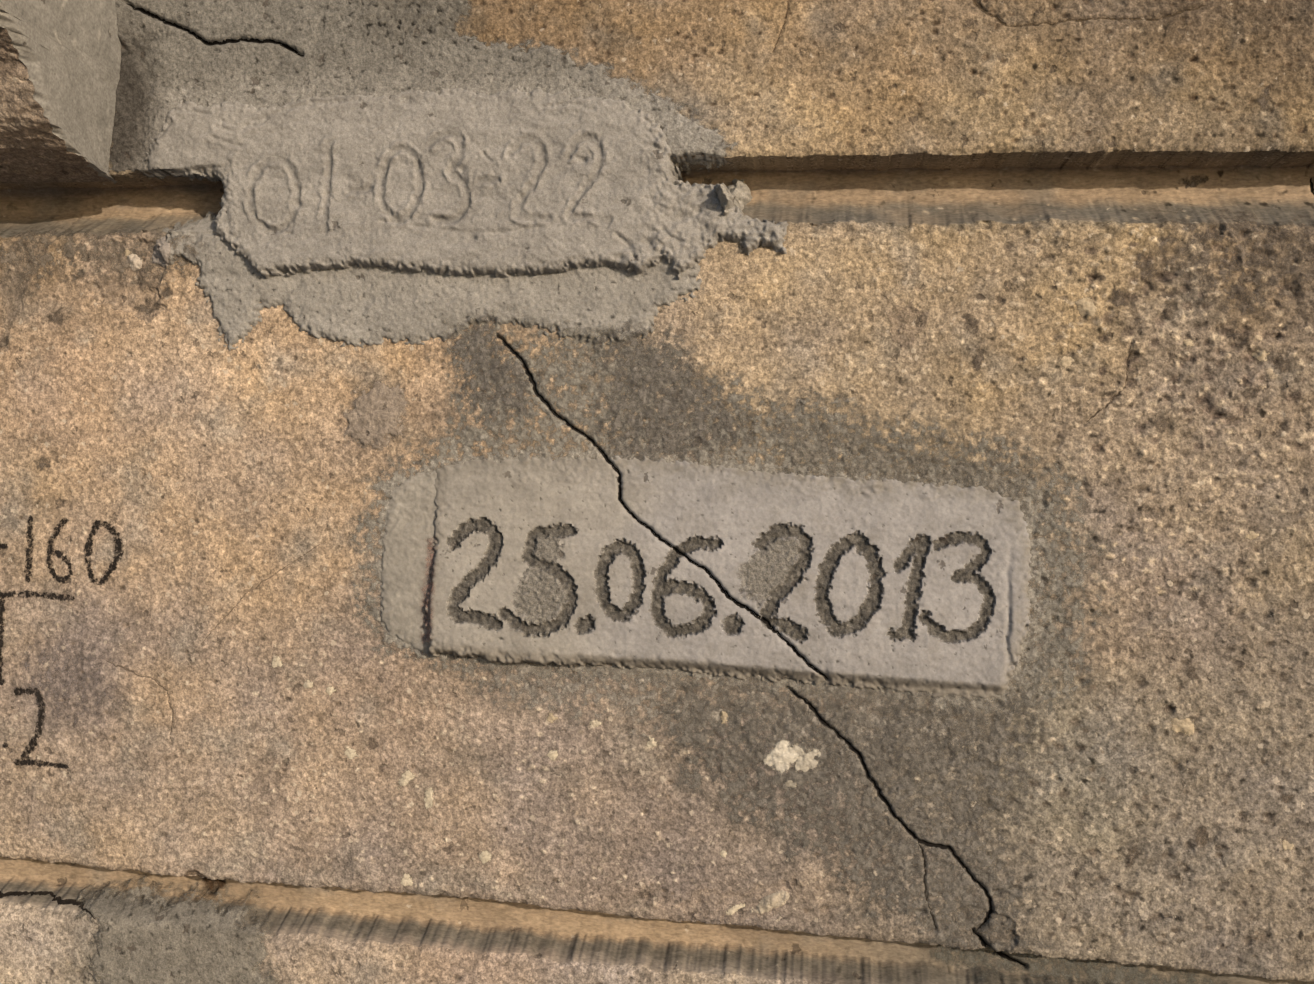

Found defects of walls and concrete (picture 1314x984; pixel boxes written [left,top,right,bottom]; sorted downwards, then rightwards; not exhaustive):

crack [128,4,304,56]
crack [497,335,1026,966]
crack [0,891,96,920]